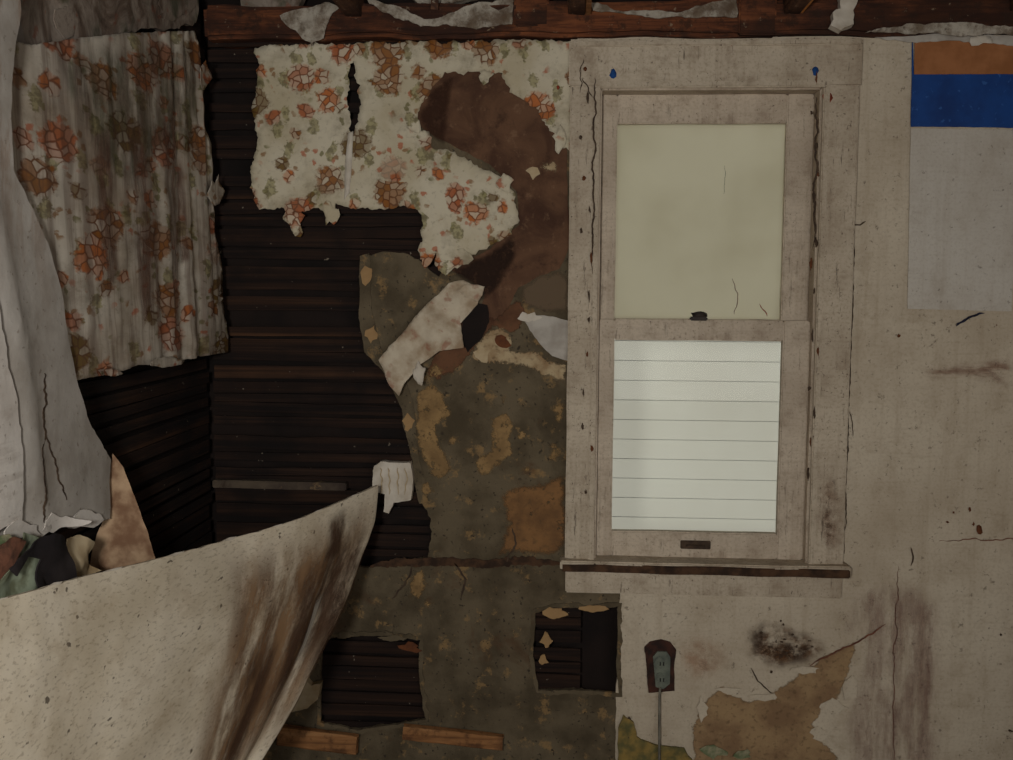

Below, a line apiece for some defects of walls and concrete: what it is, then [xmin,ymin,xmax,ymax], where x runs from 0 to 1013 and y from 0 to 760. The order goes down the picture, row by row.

flaking render [359,253,385,374]
flaking render [392,69,597,504]
crack [42,373,67,523]
flaking render [501,478,565,553]
crack [940,535,1013,543]
damp [204,521,357,760]
flaking render [316,630,429,735]
flaking render [529,602,623,697]
flaking render [617,624,885,760]
mould [753,620,818,673]